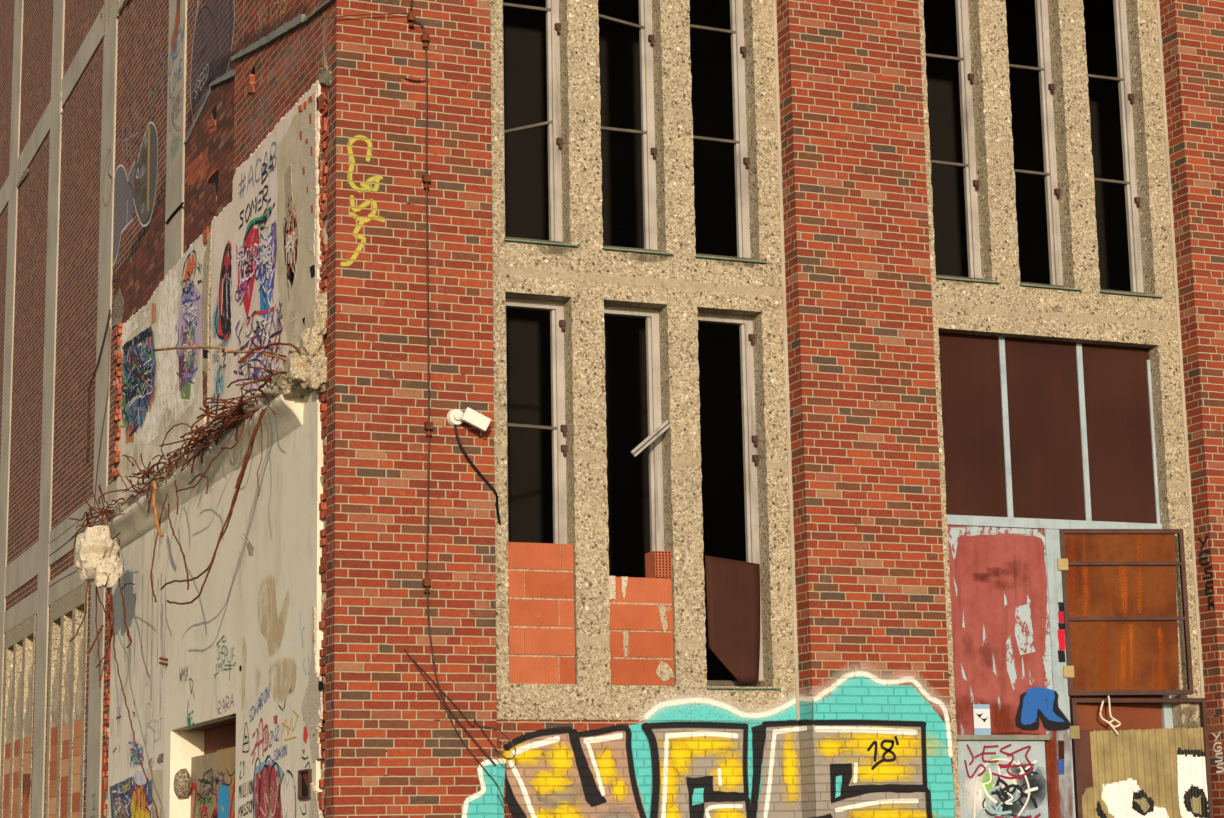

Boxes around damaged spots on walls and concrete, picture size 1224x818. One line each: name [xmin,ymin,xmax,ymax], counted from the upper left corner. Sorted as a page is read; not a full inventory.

peeling [69,62,333,605]
spalling [70,577,164,818]
damp [258,580,285,654]
flaking render [301,383,327,818]
peeling [947,526,1053,690]